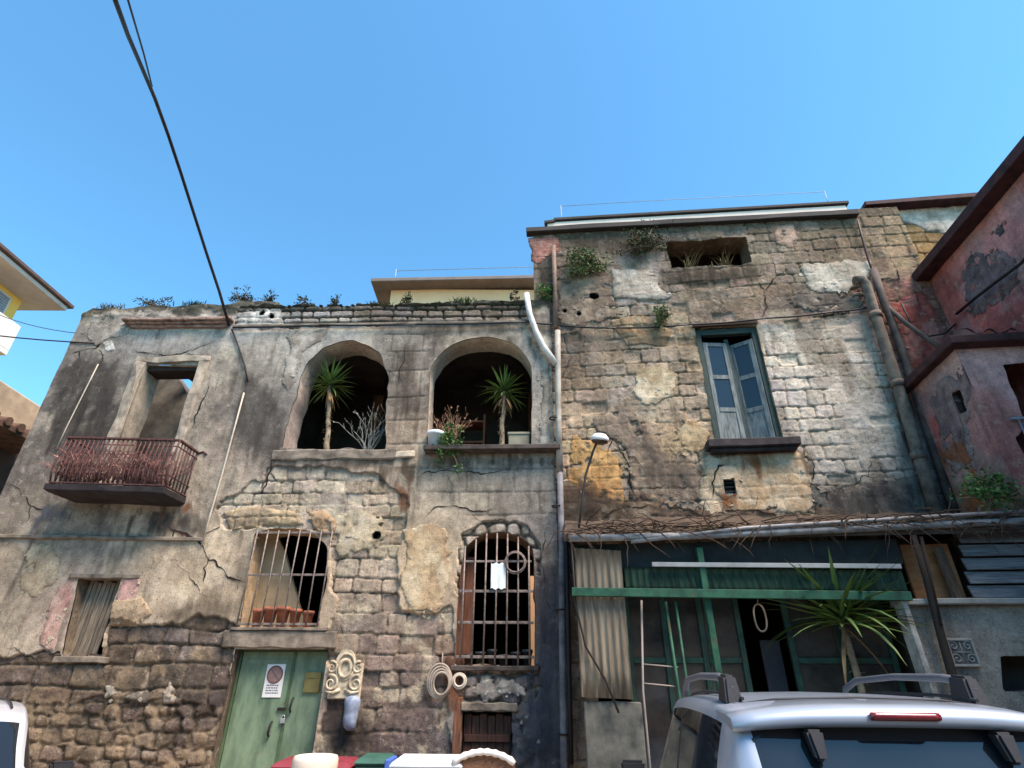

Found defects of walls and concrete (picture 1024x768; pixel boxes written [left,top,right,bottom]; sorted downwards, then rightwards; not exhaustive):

peeling [557,264,672,328]
peeling [787,259,873,320]
peeling [962,220,1020,318]
crack [135,336,220,357]
peeling [928,367,975,474]
crack [261,460,278,506]
crack [421,468,513,520]
damp [565,481,618,522]
crack [590,430,795,517]
crack [169,527,243,610]
peeling [0,543,240,768]
peeling [218,466,543,768]